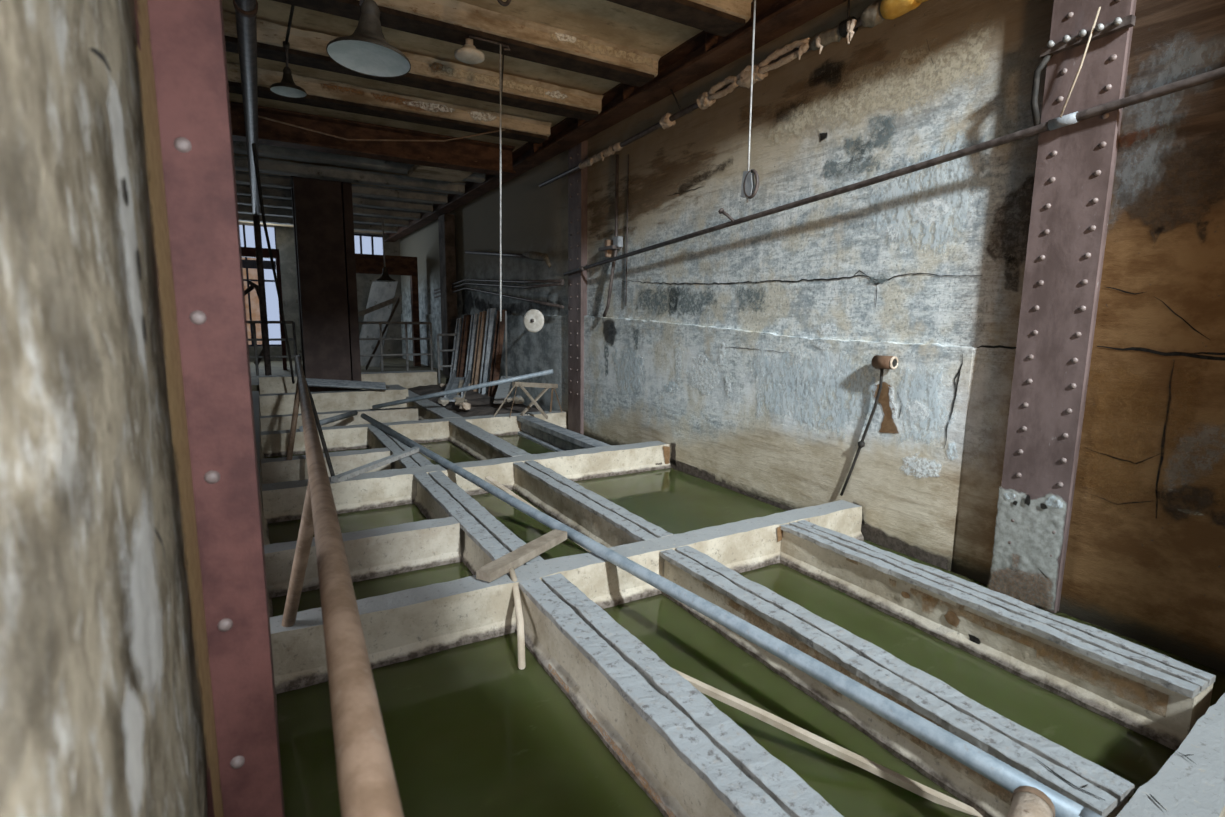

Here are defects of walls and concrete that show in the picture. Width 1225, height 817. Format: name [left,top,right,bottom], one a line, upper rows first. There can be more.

damp [987,176,1035,292]
damp [636,286,714,316]
damp [736,286,765,310]
crack [624,270,982,307]
crack [944,345,1016,448]
crack [1084,287,1225,518]